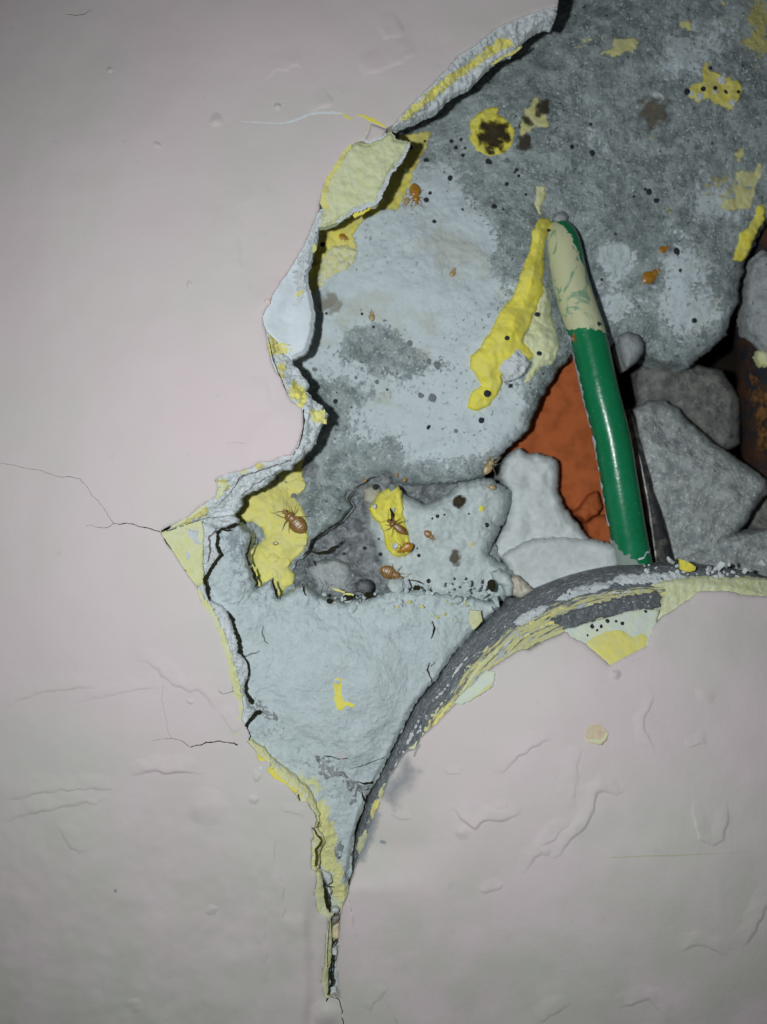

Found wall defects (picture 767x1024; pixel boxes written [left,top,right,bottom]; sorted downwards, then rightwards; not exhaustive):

leakage [478,101,549,154]
corrosion [749,374,767,451]
crack [4,463,160,532]
spalling [161,0,767,998]
crack [153,477,376,748]